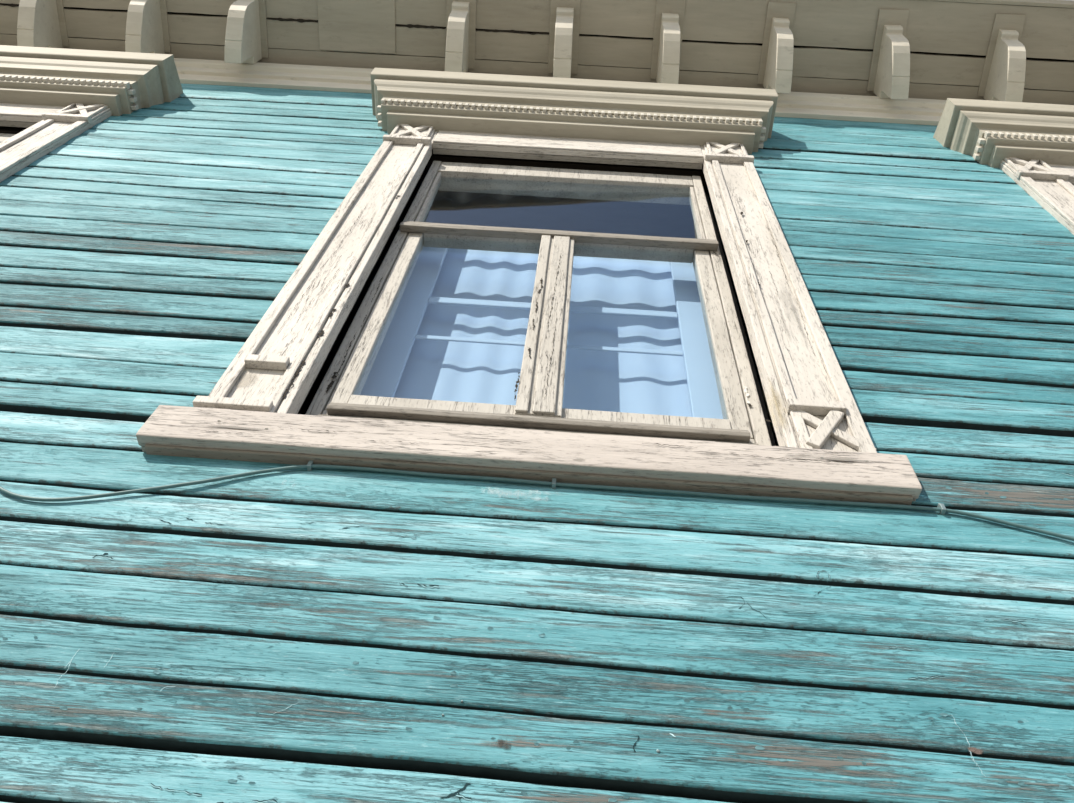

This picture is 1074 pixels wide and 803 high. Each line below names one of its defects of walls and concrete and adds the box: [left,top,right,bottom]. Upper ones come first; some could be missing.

peeling [684,700,765,720]
peeling [453,734,581,750]
peeling [703,742,894,778]
peeling [987,768,1074,792]
crack [440,783,471,803]
peeling [496,788,641,803]